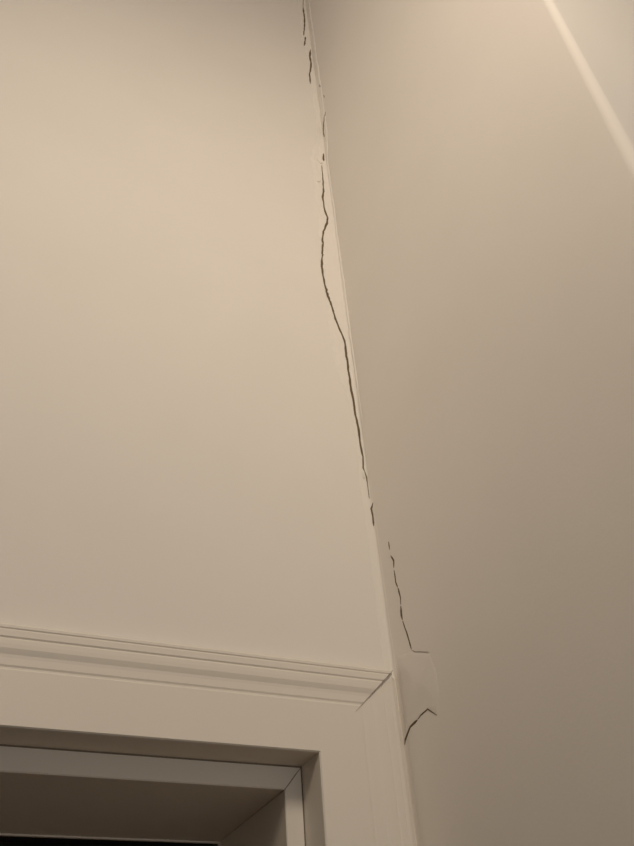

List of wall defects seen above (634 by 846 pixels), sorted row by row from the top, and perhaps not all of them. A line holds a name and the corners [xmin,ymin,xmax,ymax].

crack [303,0,374,526]
crack [388,542,420,652]
crack [404,708,437,745]